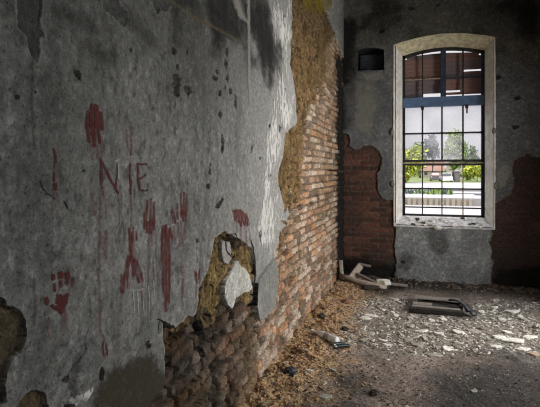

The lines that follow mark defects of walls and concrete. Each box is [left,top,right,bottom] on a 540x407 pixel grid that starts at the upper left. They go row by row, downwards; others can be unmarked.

damp [233,0,251,101]
spalling [150,0,406,407]
spalling [489,153,540,285]
spalling [0,297,27,402]
spalling [16,389,49,407]
peeling [62,387,93,407]
damp [94,355,166,407]